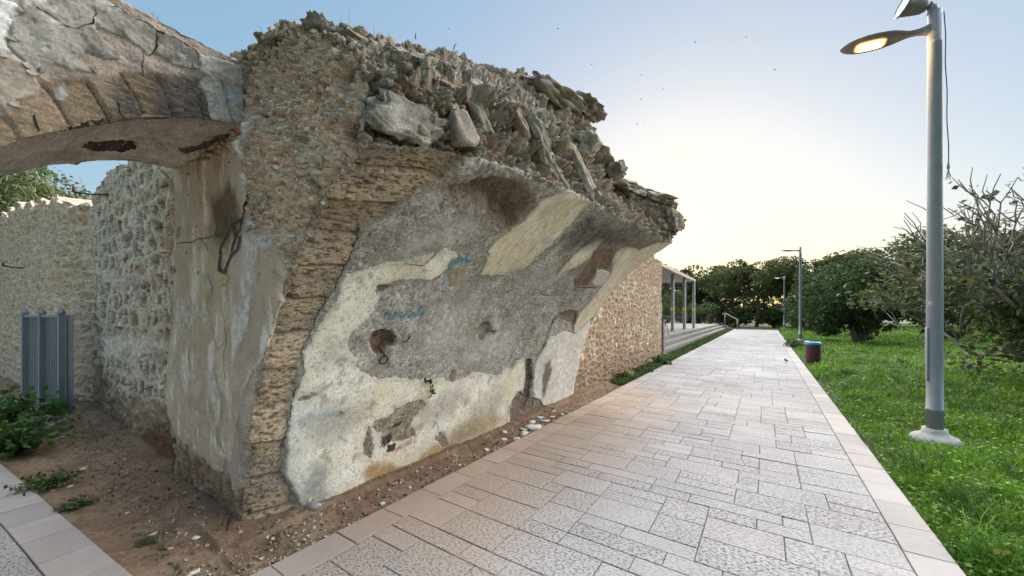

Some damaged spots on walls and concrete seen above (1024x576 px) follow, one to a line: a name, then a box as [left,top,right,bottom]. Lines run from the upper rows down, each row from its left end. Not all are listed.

flaking render [0,0,288,472]
crack [177,170,249,250]
leakage [212,112,274,349]
crack [279,205,362,459]
flaking render [280,238,673,506]
flaking render [446,175,591,276]